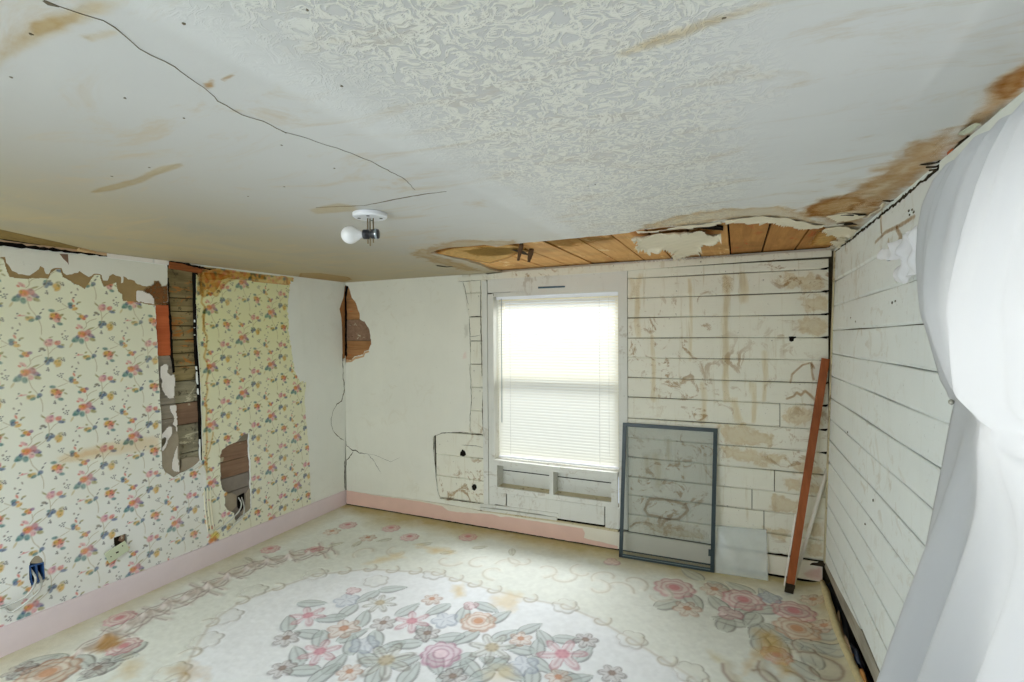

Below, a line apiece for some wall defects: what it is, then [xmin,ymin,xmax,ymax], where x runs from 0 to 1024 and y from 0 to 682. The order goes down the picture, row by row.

crack [43,0,447,208]
spalling [136,267,202,477]
spalling [220,434,250,520]
spalling [340,285,371,363]
crack [331,354,399,487]